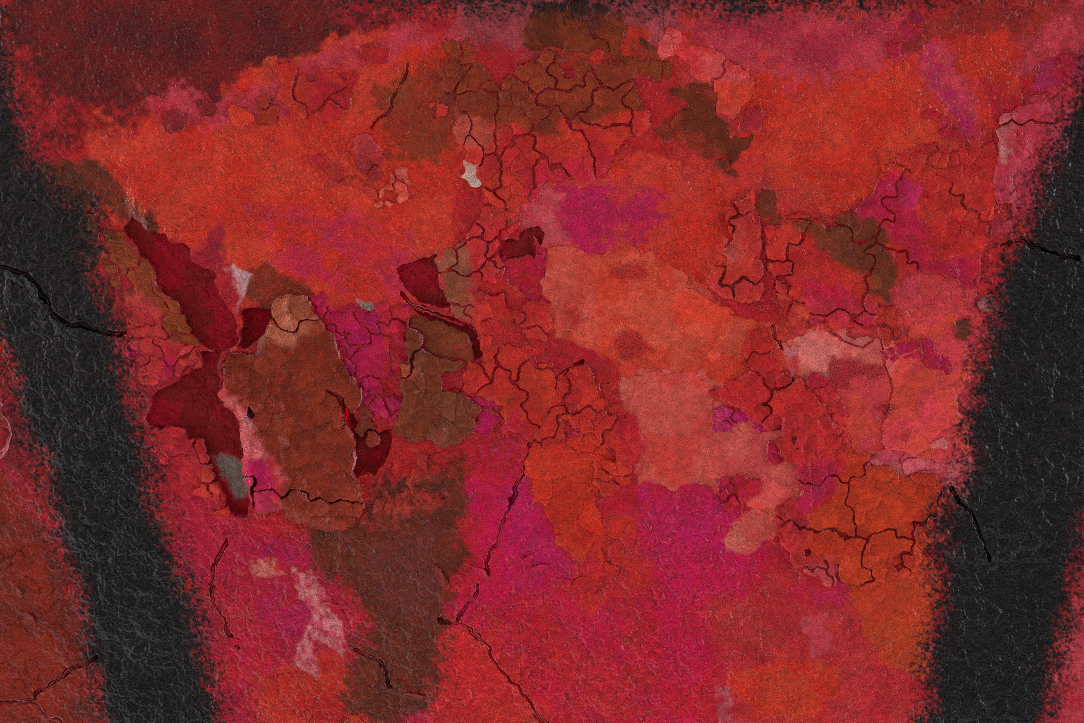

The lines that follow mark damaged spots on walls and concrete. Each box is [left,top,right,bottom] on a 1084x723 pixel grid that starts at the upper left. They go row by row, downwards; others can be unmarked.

peeling [0,355,41,479]
peeling [68,0,1084,591]
crack [0,655,98,723]
crack [440,441,548,723]